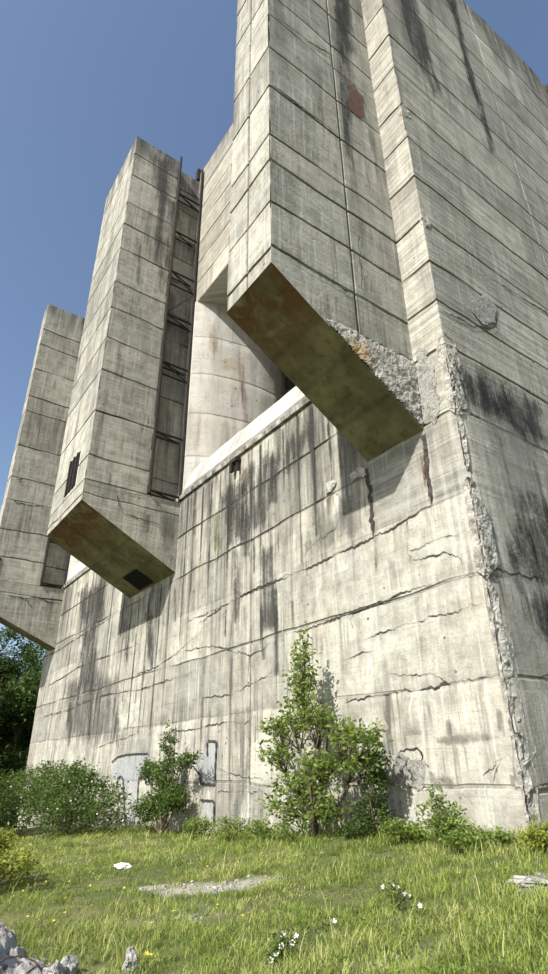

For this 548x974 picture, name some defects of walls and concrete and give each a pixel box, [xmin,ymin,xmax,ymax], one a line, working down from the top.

damp [334,0,354,155]
rust [347,84,364,117]
damp [401,0,440,91]
damp [447,0,493,152]
damp [458,365,544,446]
damp [63,405,317,734]
crack [39,483,548,750]
spalling [326,318,540,828]
damp [506,482,548,636]
crack [399,747,423,762]